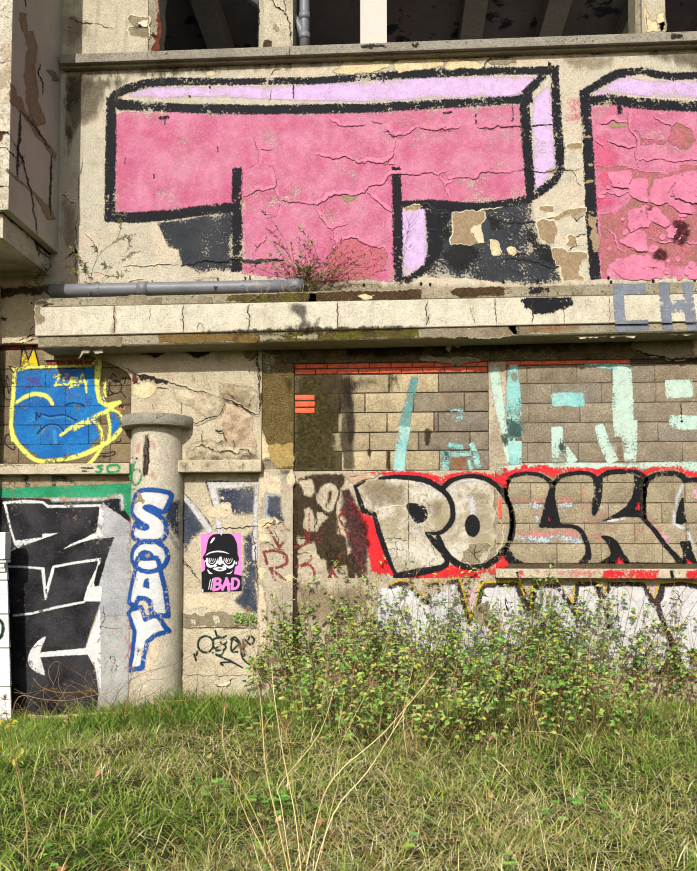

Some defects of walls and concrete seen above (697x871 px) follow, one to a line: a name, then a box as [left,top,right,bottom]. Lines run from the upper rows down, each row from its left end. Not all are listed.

peeling [9,12,59,161]
spalling [127,0,162,51]
crack [257,0,293,99]
spalling [642,5,684,40]
peeling [6,168,56,220]
crack [0,111,95,271]
peeling [227,110,697,303]
spalling [131,372,168,399]
crack [119,351,262,454]